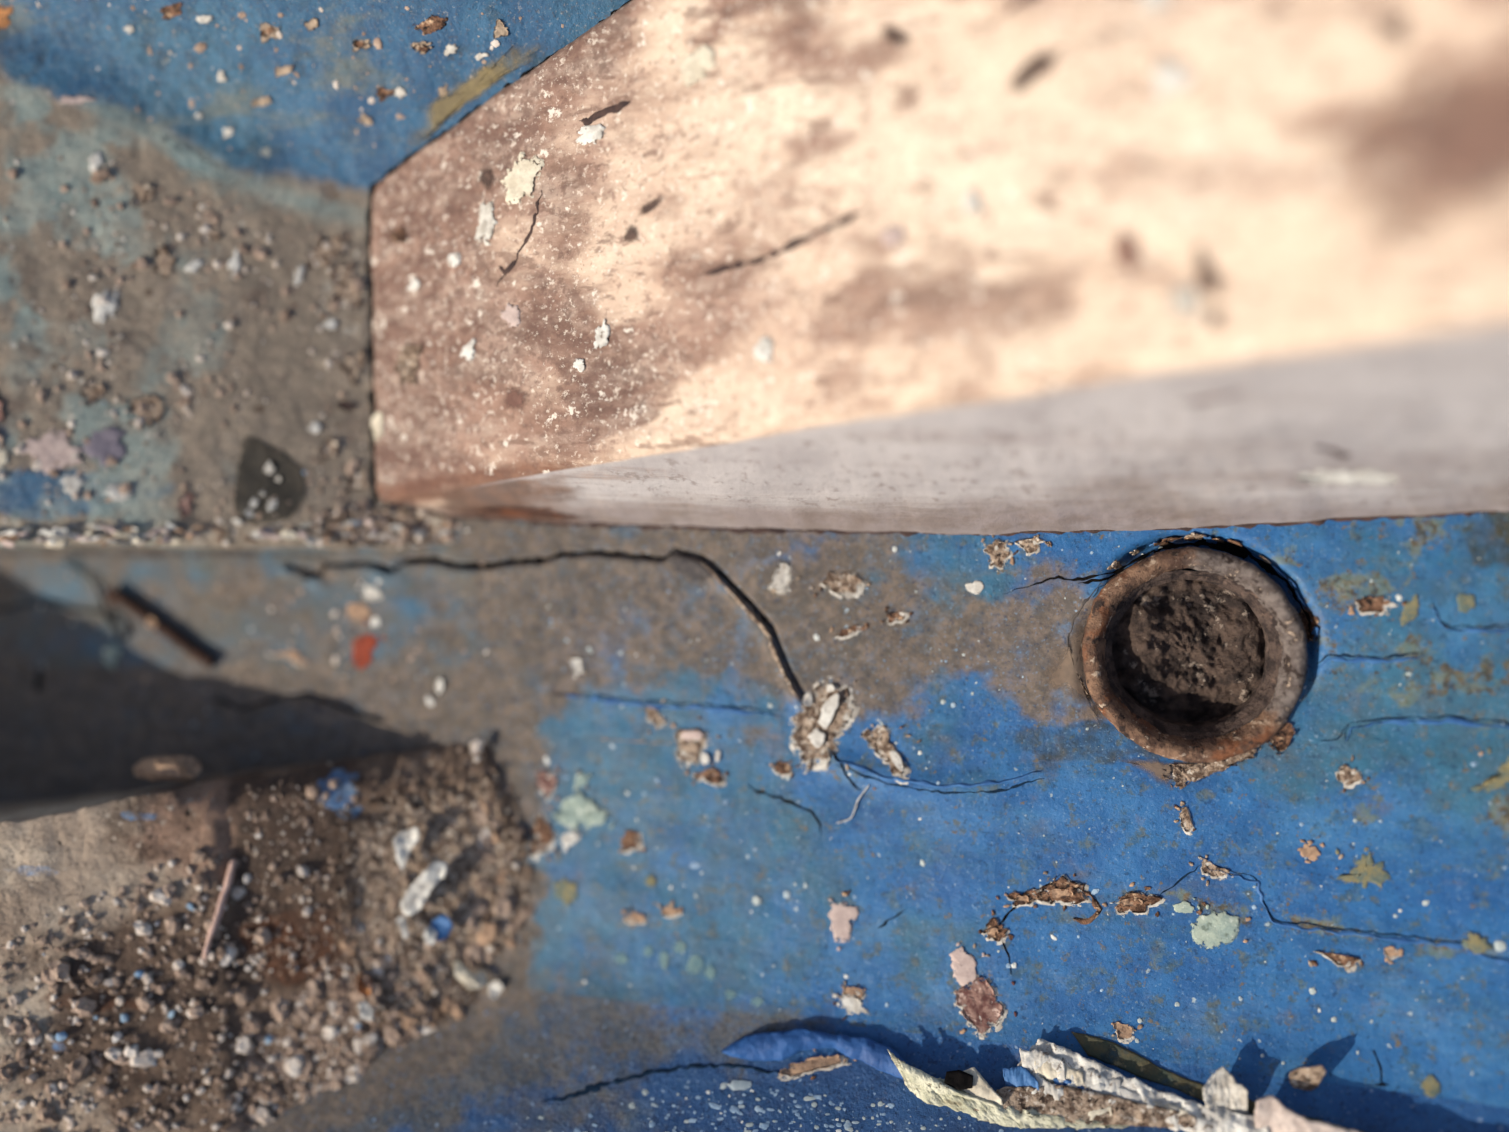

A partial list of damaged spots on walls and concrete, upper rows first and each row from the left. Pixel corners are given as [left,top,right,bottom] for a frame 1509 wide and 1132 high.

crack [289,548,799,716]
peeling [770,676,922,785]
crack [1321,715,1509,741]
crack [747,784,821,832]
crack [832,751,861,791]
corrosion [1131,761,1182,782]
spalling [328,747,579,1034]
peeling [978,871,1165,945]
crack [1159,864,1509,964]
peeling [953,974,1017,1040]
peeling [777,1049,857,1081]
peeling [887,1038,1358,1132]